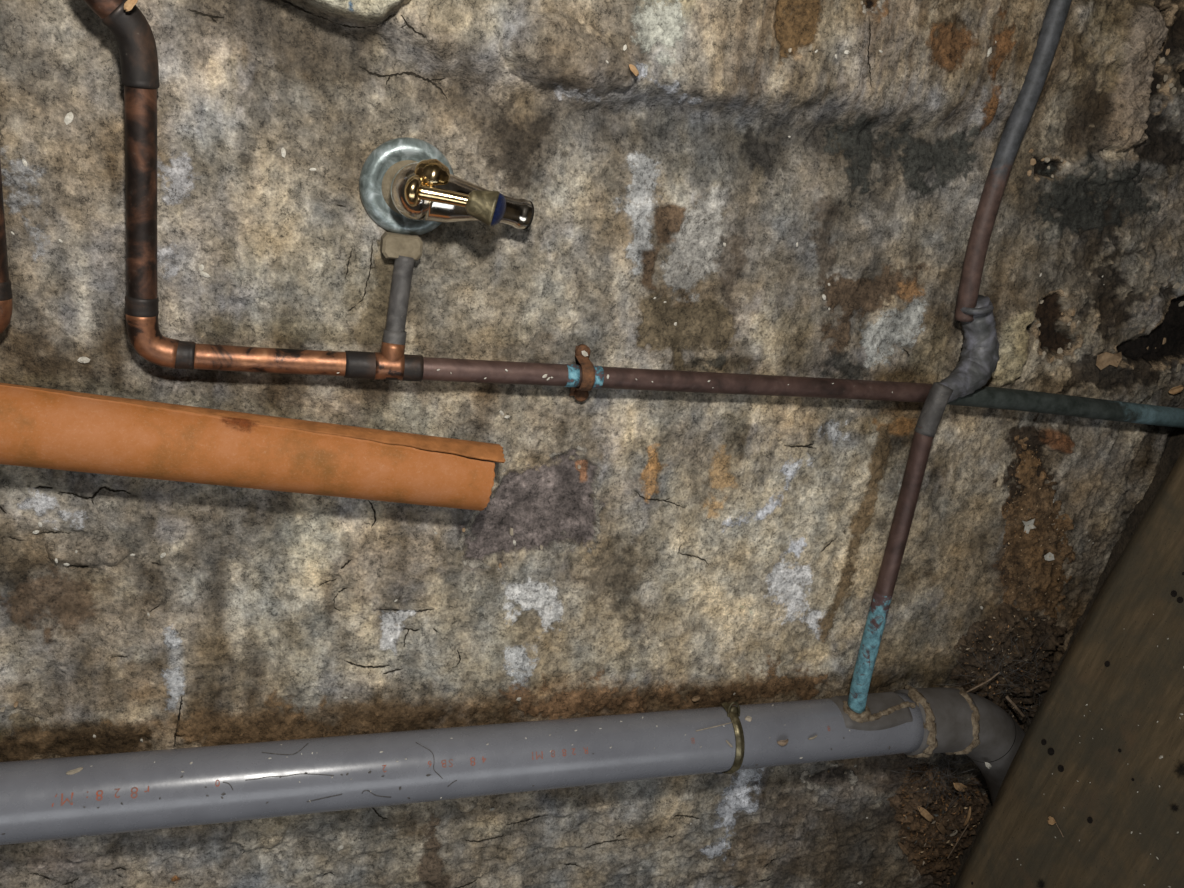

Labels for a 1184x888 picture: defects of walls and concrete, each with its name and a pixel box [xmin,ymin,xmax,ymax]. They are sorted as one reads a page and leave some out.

peeling [1156,49,1184,94]
damp [486,94,552,190]
peeling [1027,149,1064,178]
damp [1033,152,1160,241]
damp [616,152,747,371]
damp [812,114,981,380]
peeling [1035,323,1071,362]
peeling [1096,352,1122,370]
damp [993,413,1058,512]
damp [764,425,891,642]
damp [502,577,563,631]
damp [701,767,765,860]